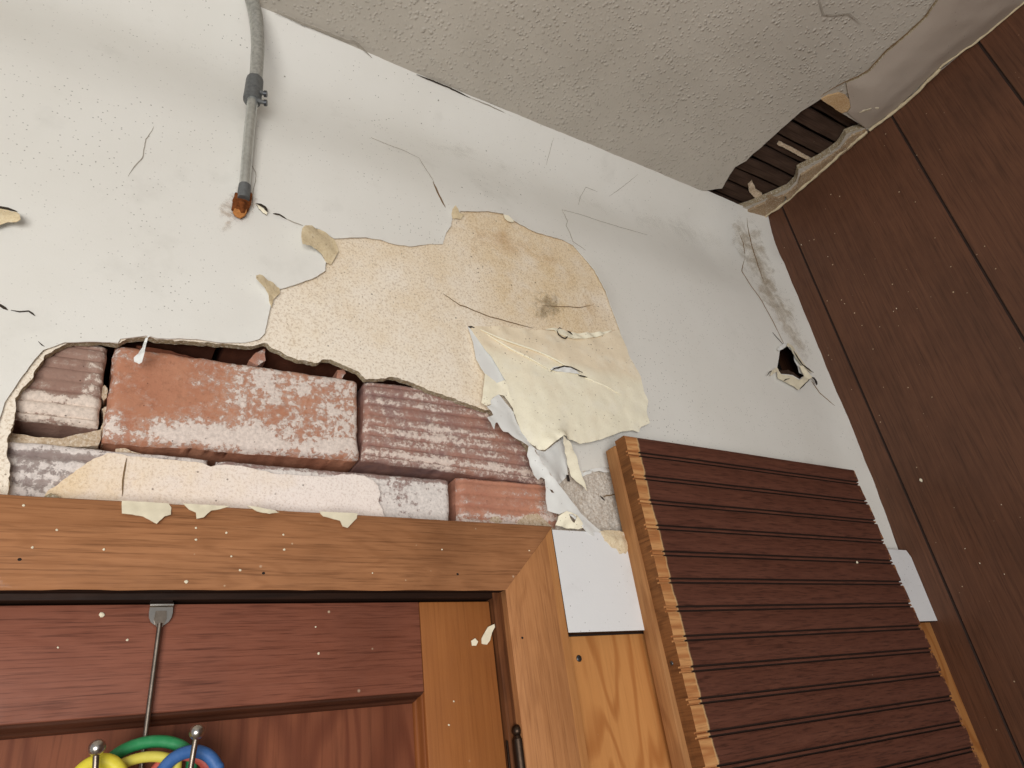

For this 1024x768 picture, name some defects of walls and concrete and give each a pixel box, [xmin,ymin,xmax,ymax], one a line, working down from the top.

crack [274,11,372,58]
crack [416,74,511,116]
spalling [821,92,879,113]
crack [373,138,445,206]
corrosion [231,192,252,219]
crack [562,179,647,250]
spalling [0,205,650,554]
spalling [768,343,818,390]